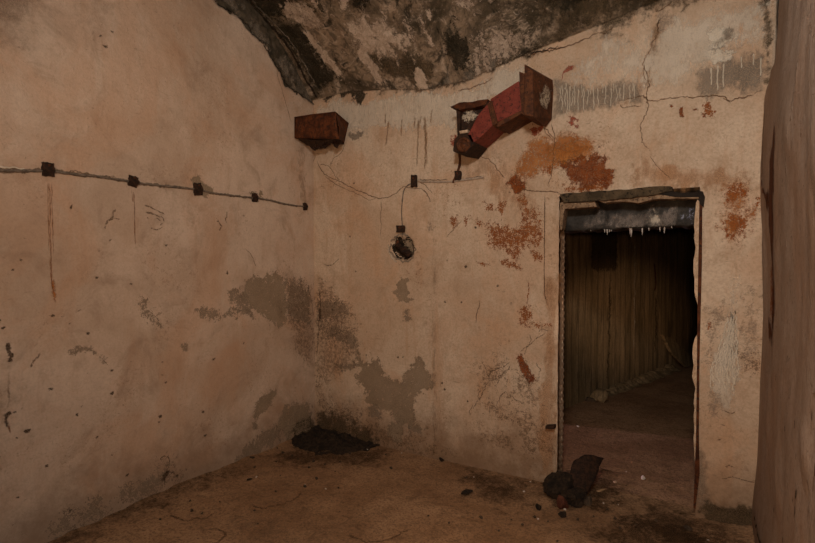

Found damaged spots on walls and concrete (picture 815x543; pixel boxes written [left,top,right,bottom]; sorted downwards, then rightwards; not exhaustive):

damp [247,0,523,164]
crack [528,29,612,57]
damp [518,0,773,113]
crack [620,4,752,177]
rust [450,132,615,271]
rust [717,126,775,345]
flaking render [234,389,313,461]
flaking render [195,270,446,443]
rust [478,354,539,403]